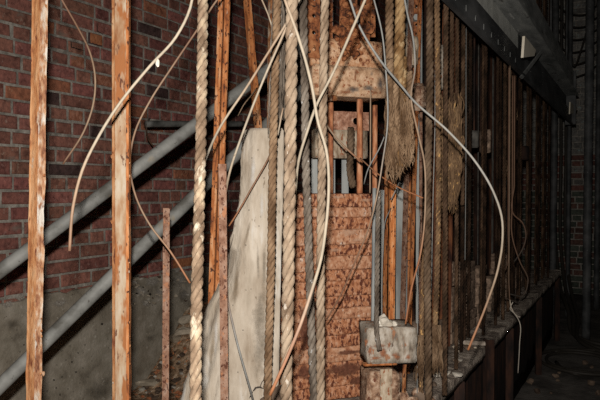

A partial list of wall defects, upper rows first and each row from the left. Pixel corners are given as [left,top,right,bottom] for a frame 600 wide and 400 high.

rust [300,311,308,349]
rust [328,340,410,384]